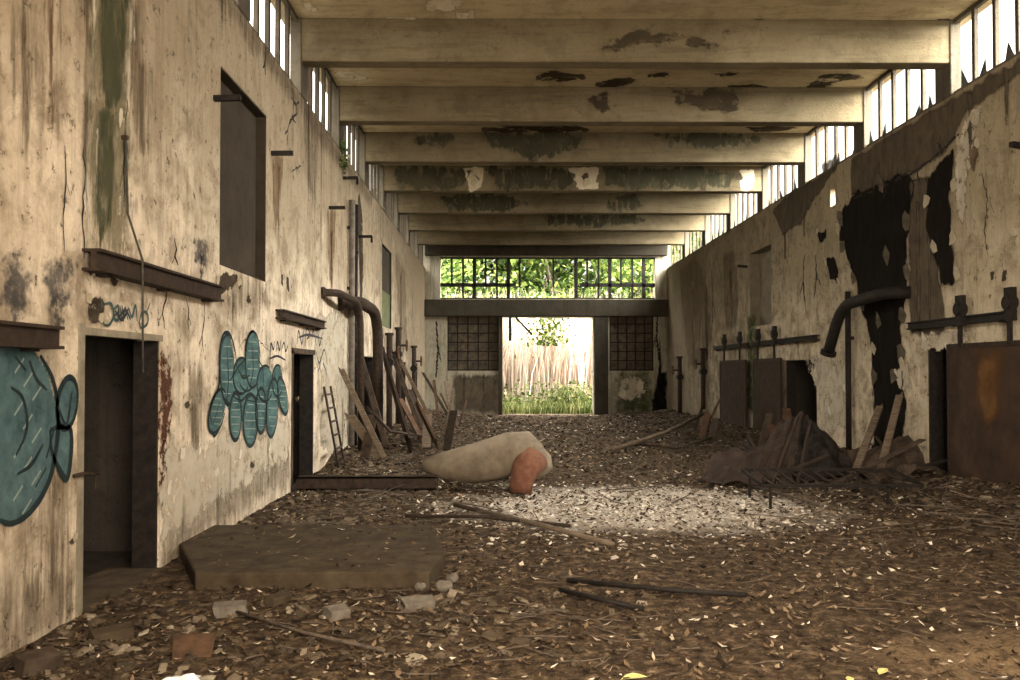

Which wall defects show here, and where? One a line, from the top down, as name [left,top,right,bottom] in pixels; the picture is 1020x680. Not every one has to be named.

leakage [83,0,135,258]
peeling [394,126,754,228]
peeling [536,71,636,113]
peeling [647,72,768,113]
flaking render [816,107,982,449]